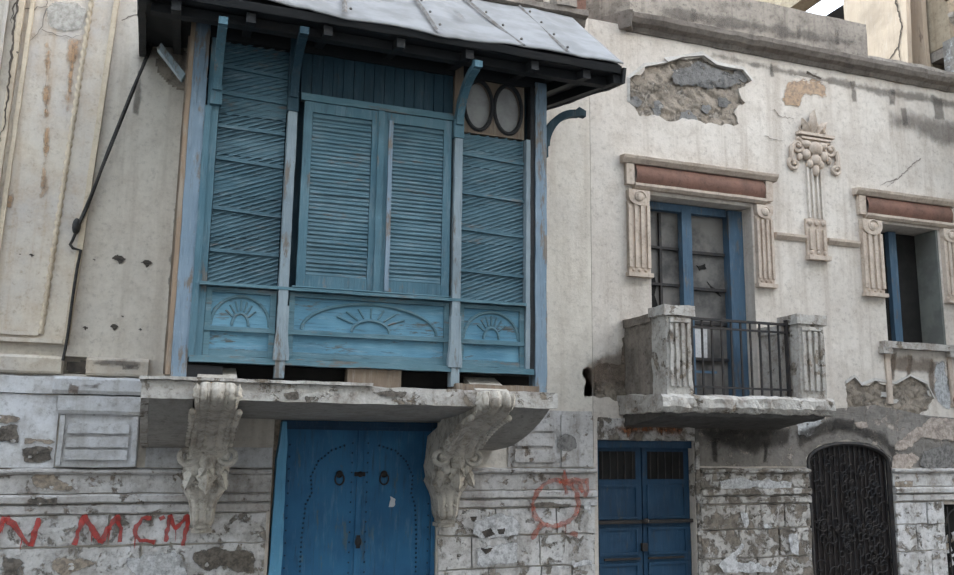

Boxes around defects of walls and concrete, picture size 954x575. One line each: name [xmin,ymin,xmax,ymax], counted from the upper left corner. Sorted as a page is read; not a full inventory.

crack [890,0,903,61]
crack [0,0,82,140]
spalling [627,51,753,126]
peeling [783,79,826,106]
peeling [0,415,77,506]
peeling [719,477,793,489]
spalling [845,374,954,487]
peeling [127,547,256,575]
peeling [719,543,777,573]
peeling [789,533,799,556]